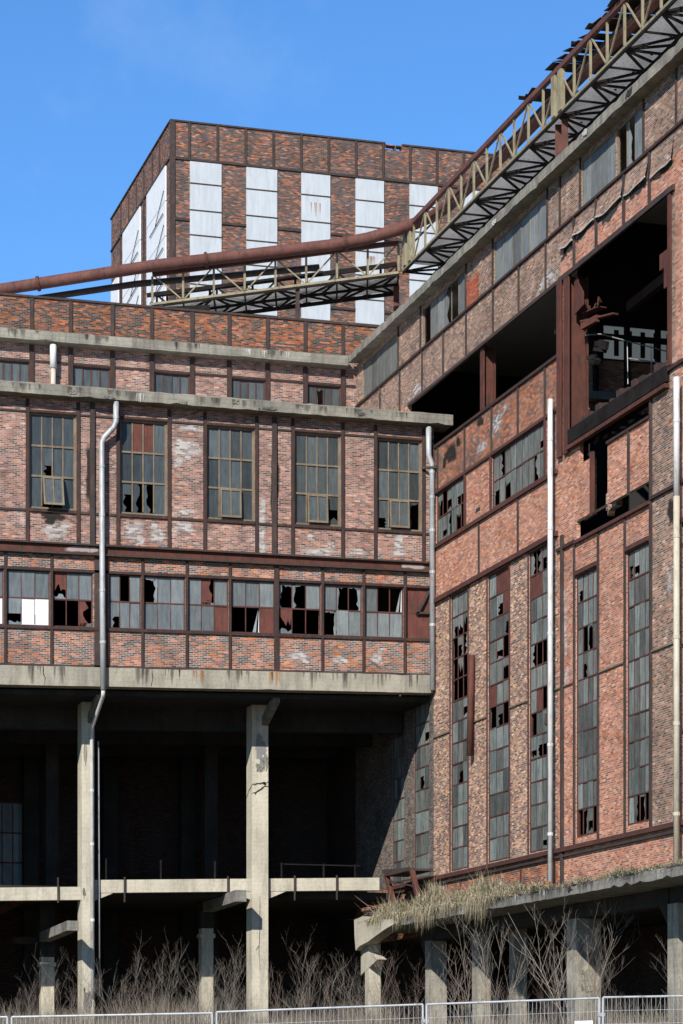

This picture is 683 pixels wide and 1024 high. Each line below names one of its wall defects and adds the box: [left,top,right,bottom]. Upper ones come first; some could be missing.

damp [174,425,201,467]
damp [44,517,70,539]
damp [126,510,195,545]
crack [246,782,268,798]